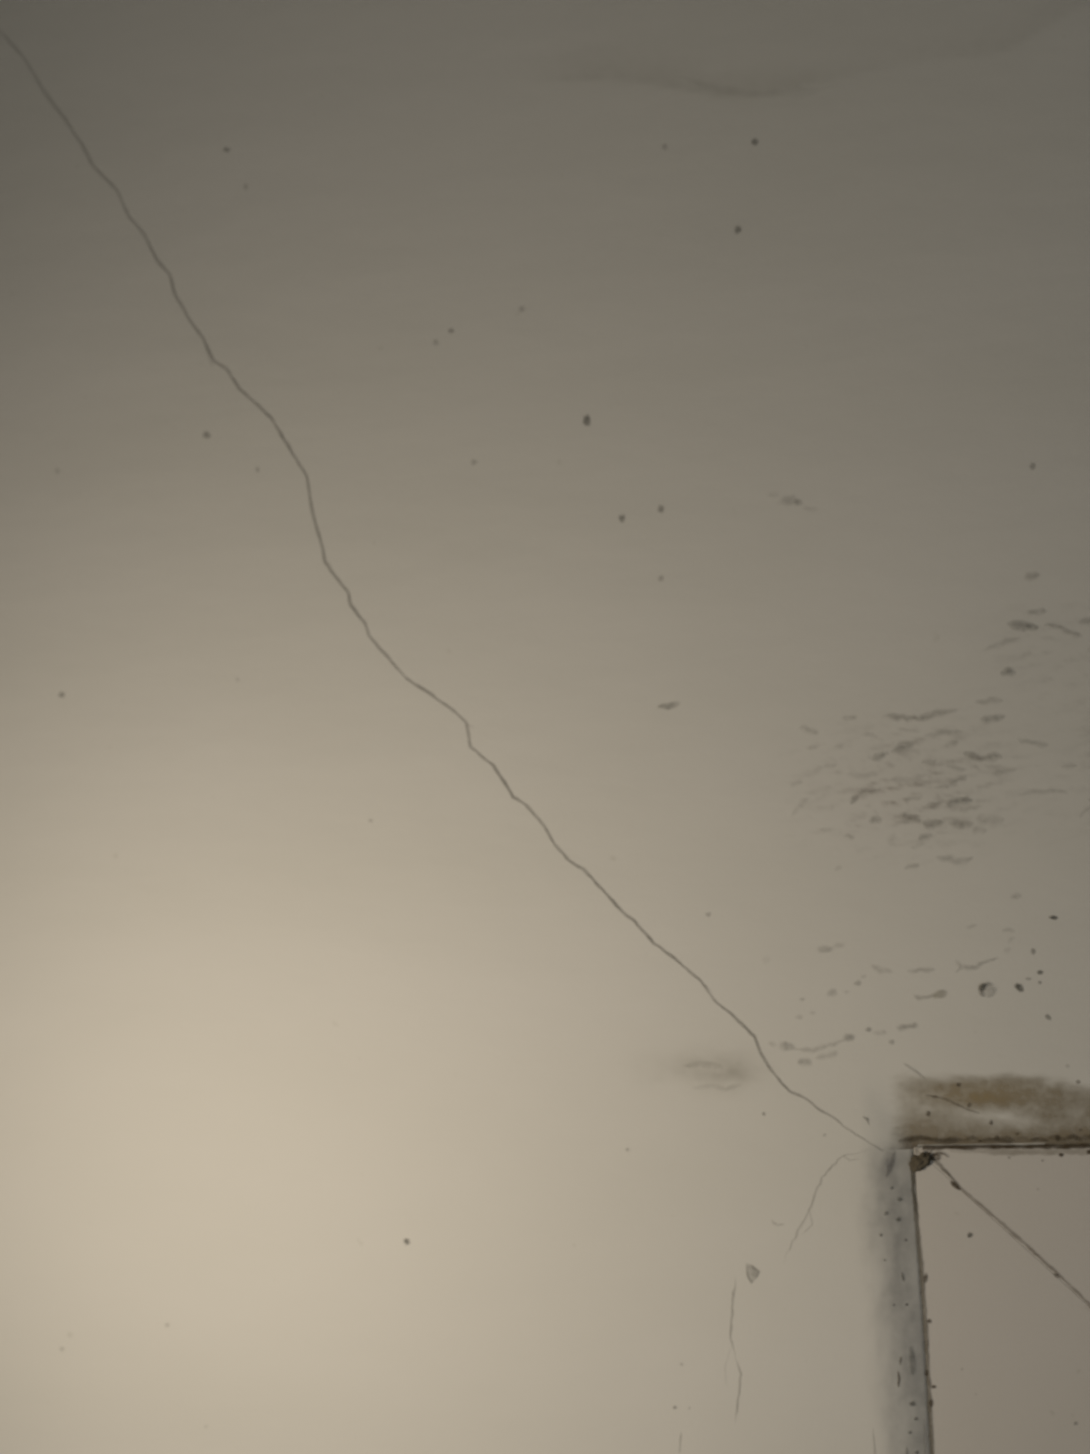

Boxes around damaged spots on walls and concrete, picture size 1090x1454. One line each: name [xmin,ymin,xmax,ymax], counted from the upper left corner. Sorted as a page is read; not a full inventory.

leakage [905,1081,1090,1149]